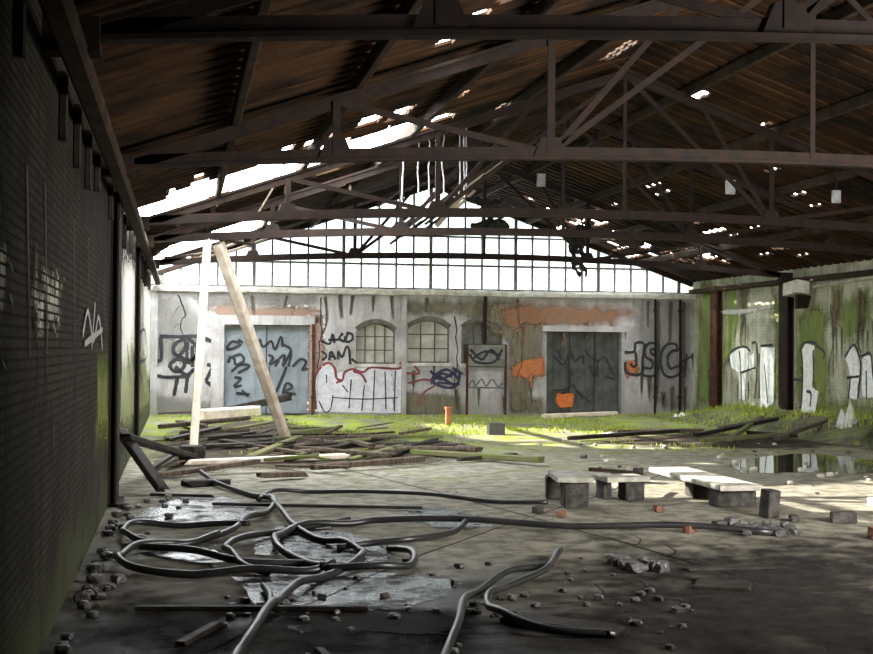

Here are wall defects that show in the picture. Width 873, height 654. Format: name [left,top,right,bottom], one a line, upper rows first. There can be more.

damp [796,289,873,418]